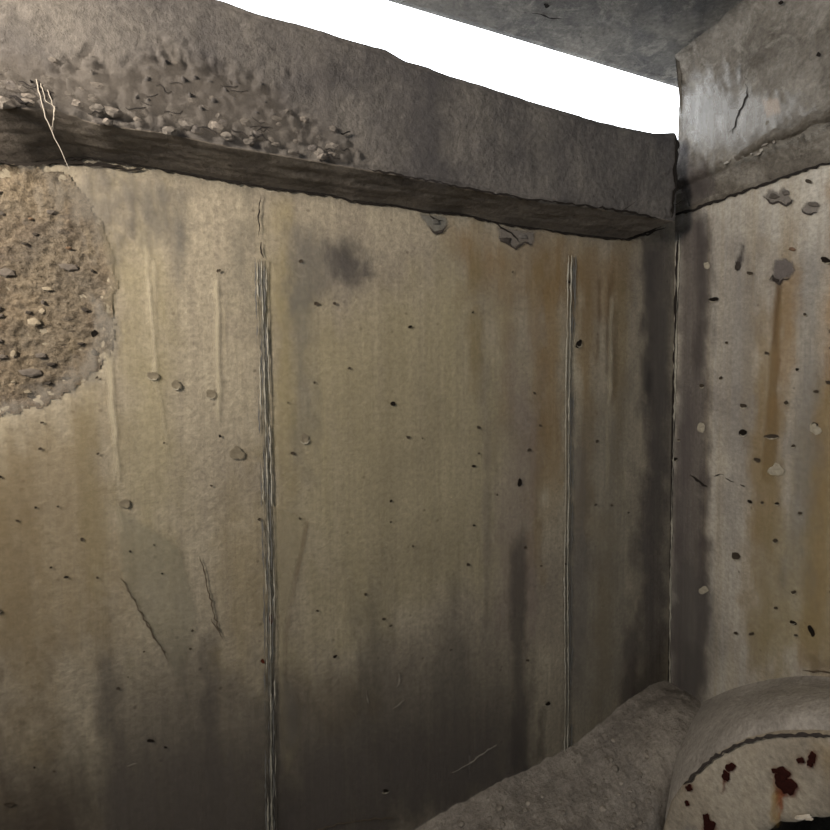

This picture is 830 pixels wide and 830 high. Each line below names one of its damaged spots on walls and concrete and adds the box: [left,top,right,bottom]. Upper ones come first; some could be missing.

crack [730,76,748,132]
crack [0,135,830,258]
spalling [764,188,792,206]
spalling [802,202,819,215]
spalling [0,164,118,416]
crack [120,578,167,659]
water stain [106,723,261,830]
water stain [281,704,528,830]
corrosion [721,762,736,782]
corrosion [771,766,797,806]
corrosion [796,751,816,767]
corrosion [703,813,716,830]